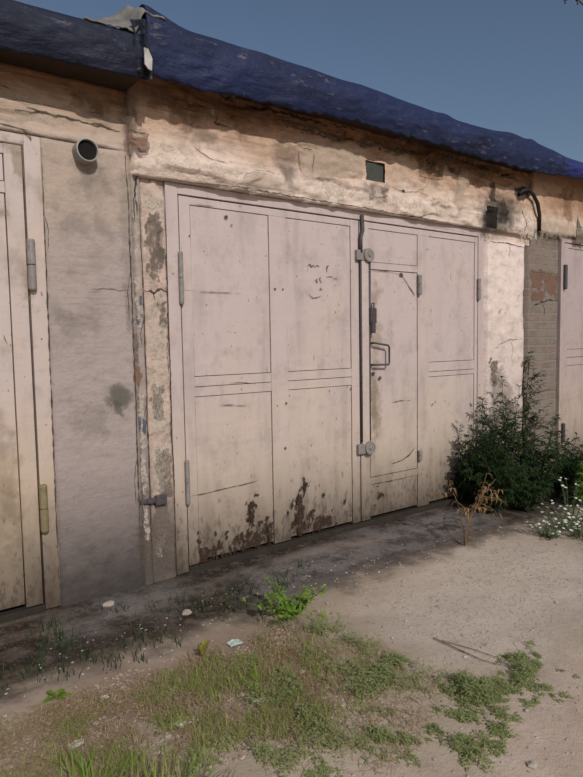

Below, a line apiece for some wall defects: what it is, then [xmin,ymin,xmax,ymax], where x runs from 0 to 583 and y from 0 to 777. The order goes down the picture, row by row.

crack [160,178,475,230]
leakage [484,182,509,235]
spalling [530,269,558,301]
crack [0,107,176,591]
peeling [132,196,173,497]
leakage [111,386,130,415]
rust [194,494,274,567]
rust [287,477,337,537]